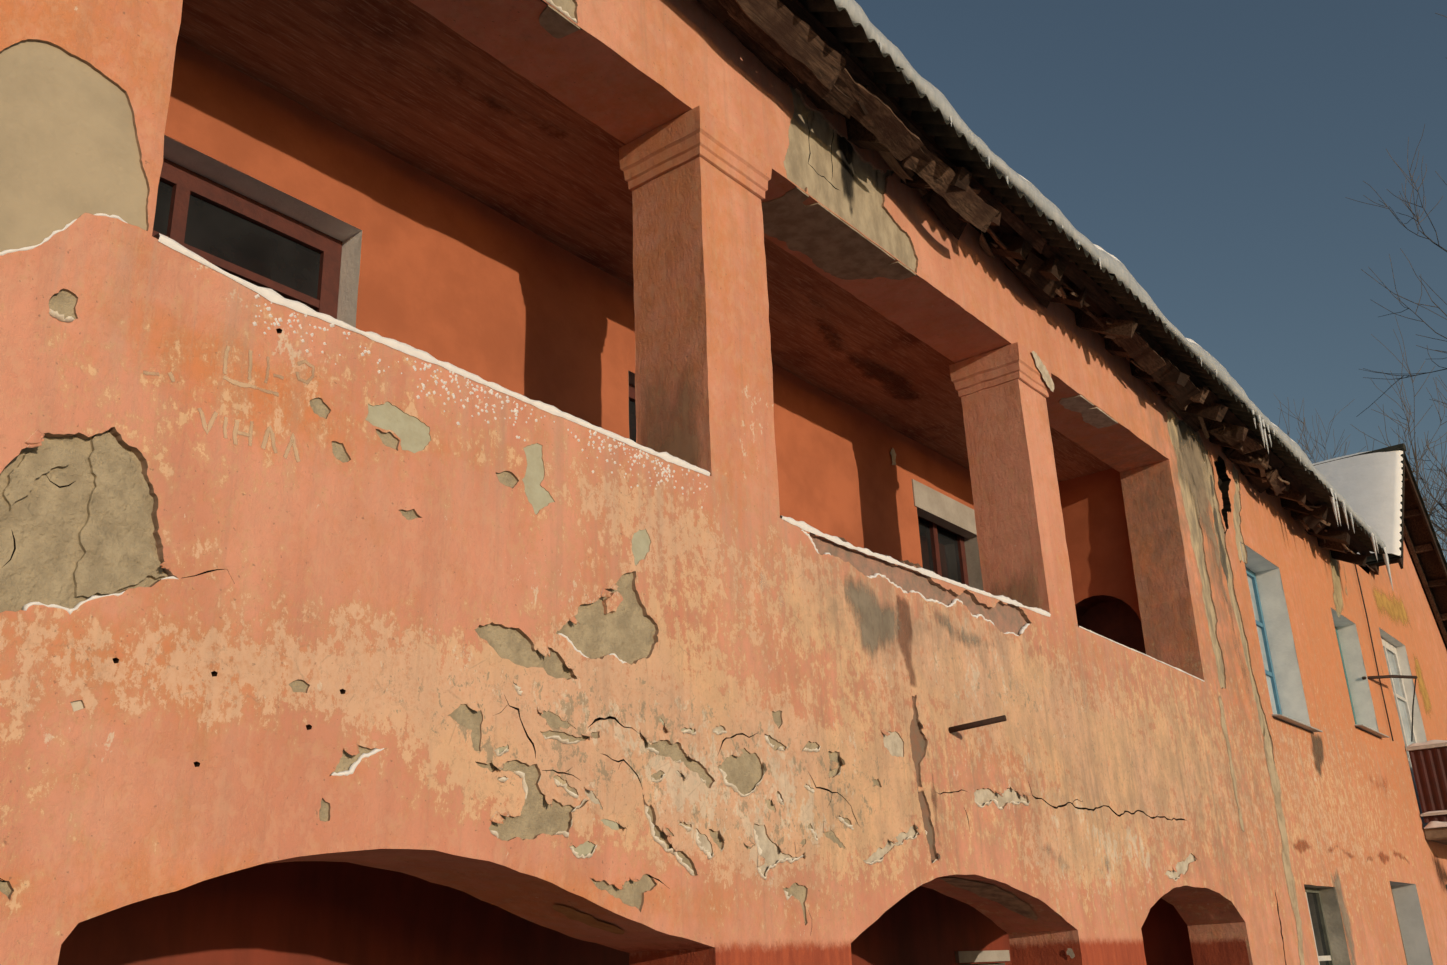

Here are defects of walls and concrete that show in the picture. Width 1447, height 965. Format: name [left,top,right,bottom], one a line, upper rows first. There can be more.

spalling [539,0,582,39]
spalling [0,39,150,256]
spalling [761,86,919,280]
spalling [0,427,178,614]
spalling [474,529,659,680]
water stain [1175,421,1231,606]
spalling [1166,410,1275,765]
peeling [447,701,627,859]
peeling [640,710,854,880]
peeling [863,695,1038,921]
crack [1028,782,1187,821]
water stain [1264,726,1305,965]